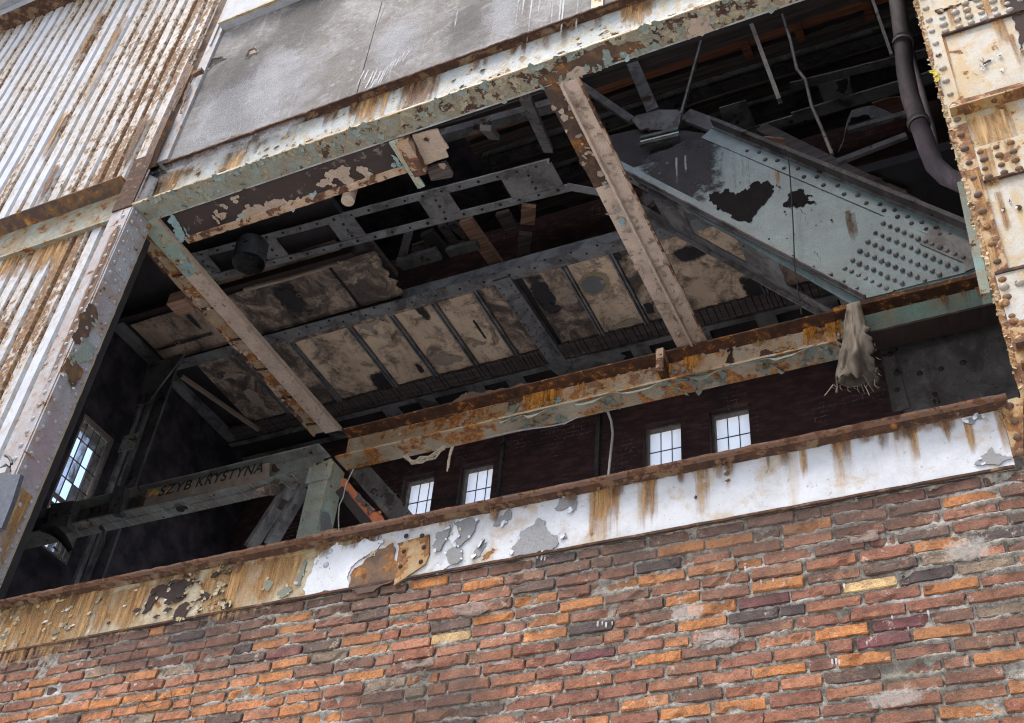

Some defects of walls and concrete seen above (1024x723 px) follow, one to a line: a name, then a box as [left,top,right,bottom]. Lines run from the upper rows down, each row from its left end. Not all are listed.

peeling [505,0,776,241]
peeling [142,118,385,331]
peeling [709,181,823,223]
corrosion [968,108,1014,226]
corrosion [52,227,121,370]
peeling [59,303,98,389]
corrosion [861,418,974,456]
corrosion [0,572,183,662]
peeling [122,564,233,622]
corrosion [197,529,334,616]
corrosion [344,520,384,546]
peeling [510,518,567,556]